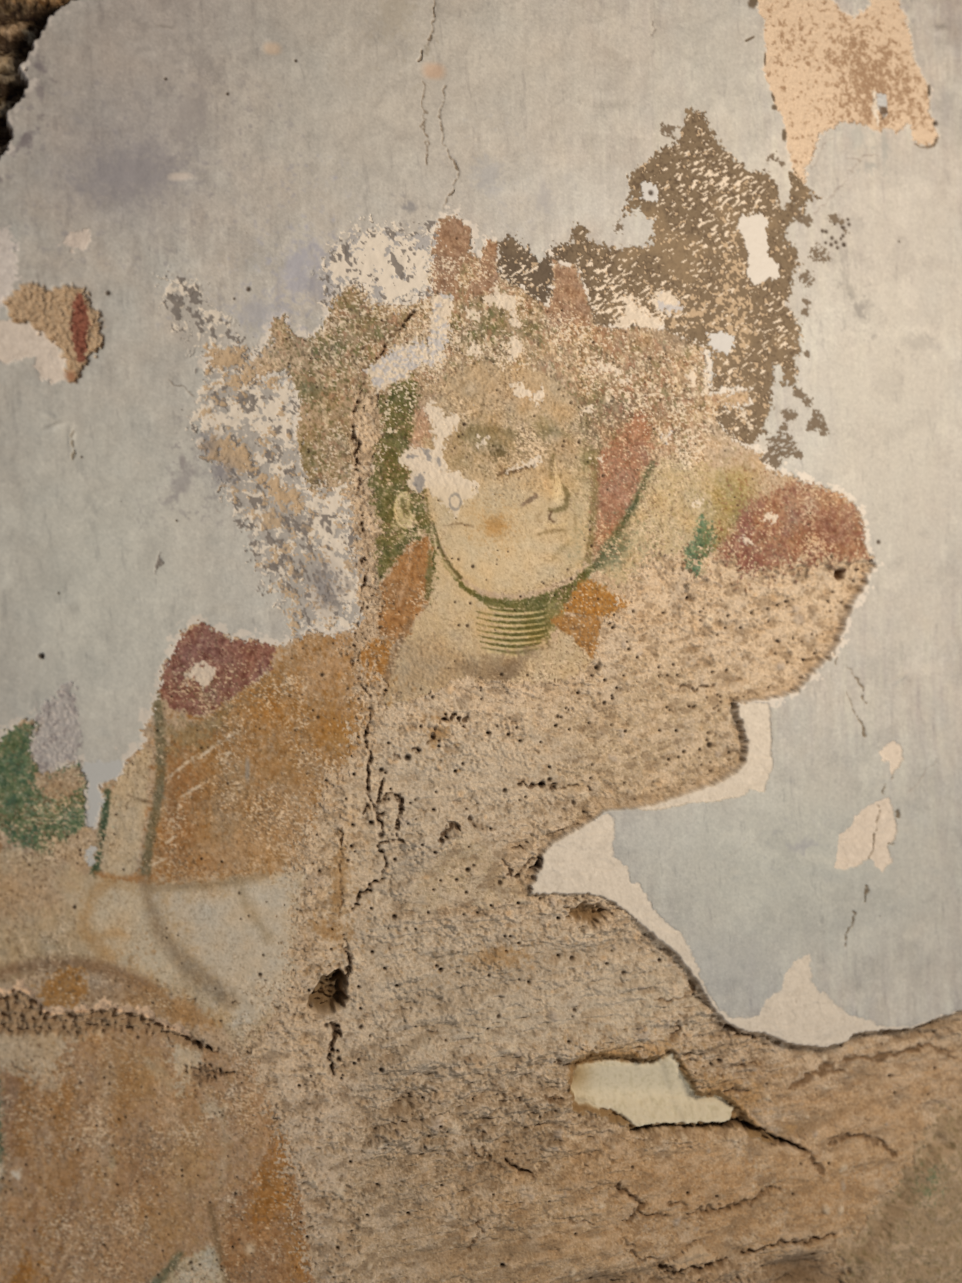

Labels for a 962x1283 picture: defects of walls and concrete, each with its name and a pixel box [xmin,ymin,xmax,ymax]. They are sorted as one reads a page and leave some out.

peeling [63,229,92,251]
peeling [465,0,939,471]
peeling [0,282,105,386]
peeling [30,682,83,777]
flaking render [158,214,962,1283]
crack [338,714,472,908]
crack [507,846,543,878]
crack [0,979,213,1052]
crack [327,1021,343,1073]
crack [632,1024,898,1176]
crack [788,1043,953,1090]
crack [615,1183,830,1275]